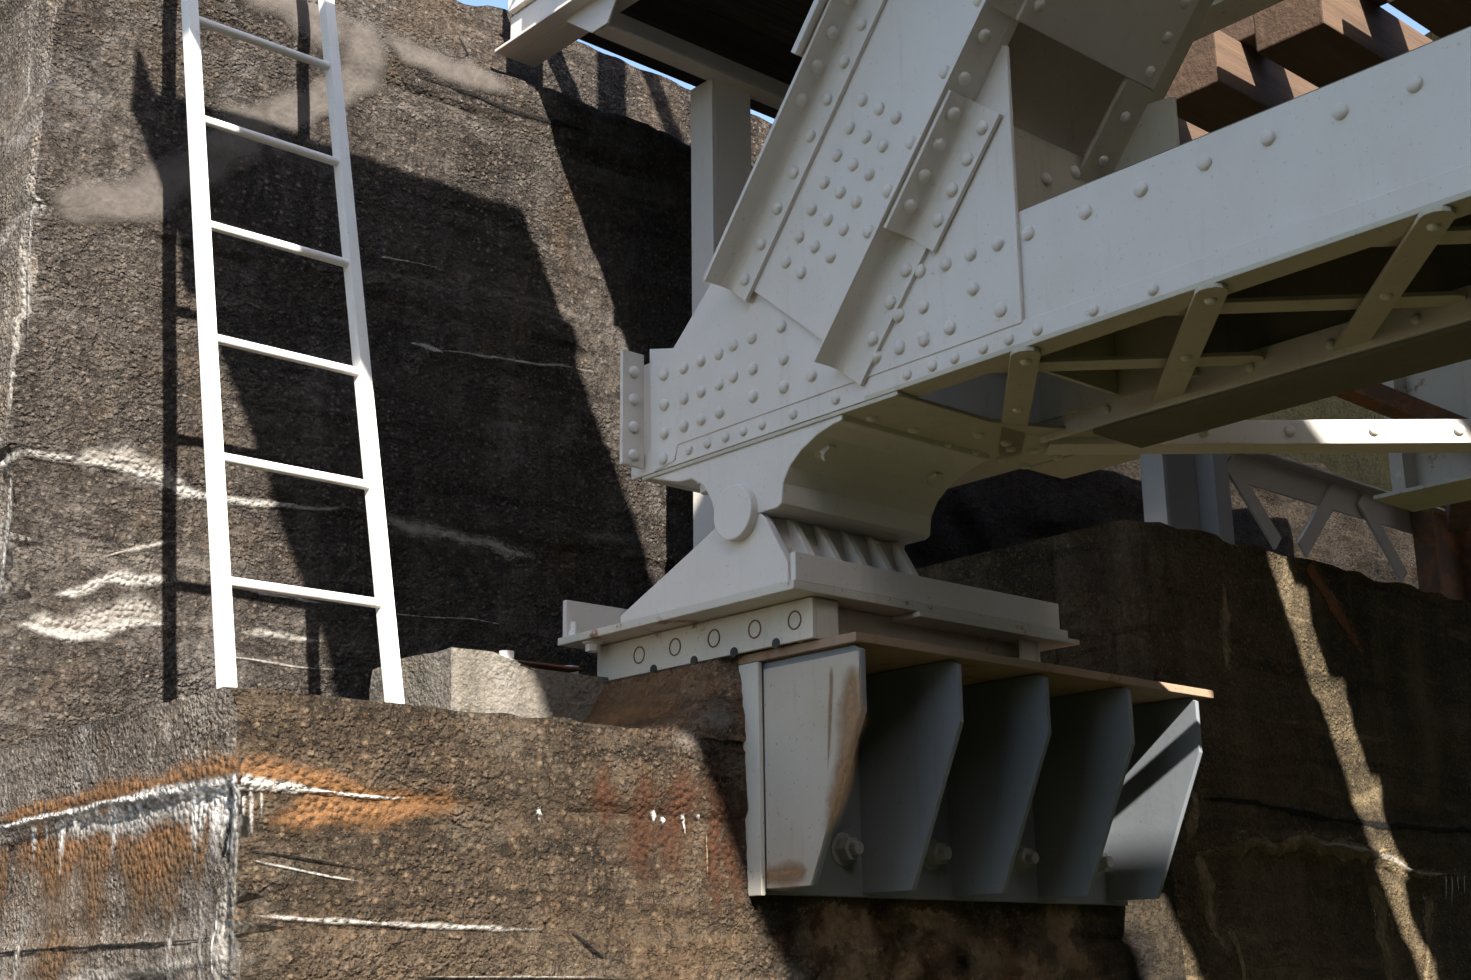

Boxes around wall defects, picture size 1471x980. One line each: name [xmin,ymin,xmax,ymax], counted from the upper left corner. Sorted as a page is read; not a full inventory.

corrosion [588,689,676,726]
crack [1204,797,1471,833]
corrosion [0,758,447,929]
damp [0,774,517,980]
corrosion [37,930,69,980]